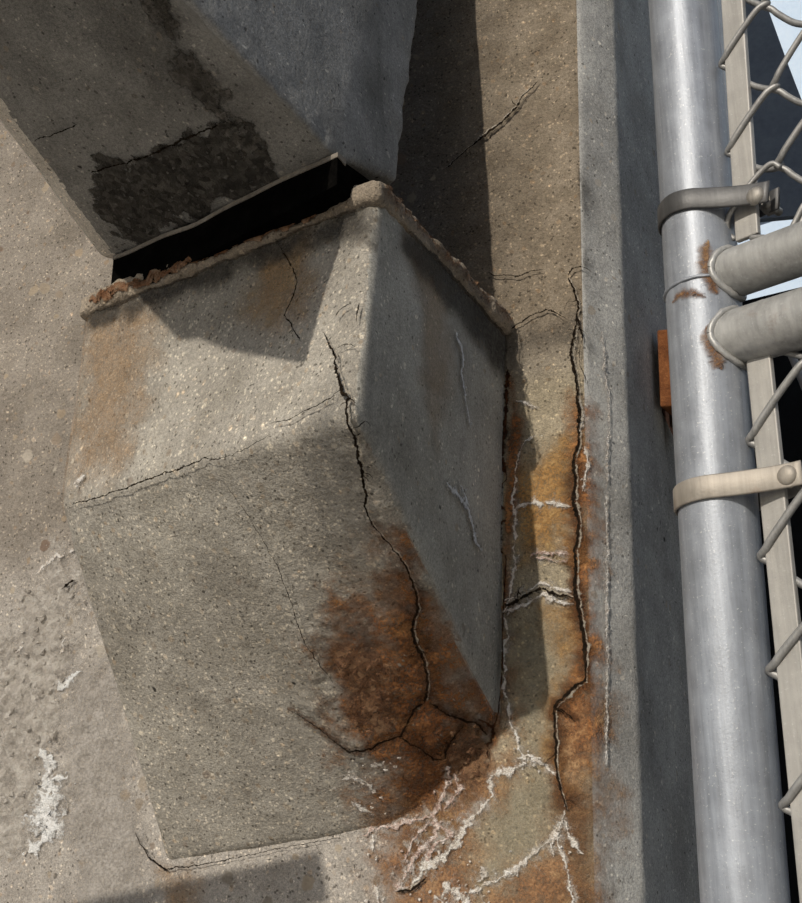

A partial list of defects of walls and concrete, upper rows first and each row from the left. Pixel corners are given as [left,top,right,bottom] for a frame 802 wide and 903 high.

spalling [88,0,280,252]
crack [446,82,537,168]
spalling [89,214,316,303]
crack [280,247,300,340]
damp [21,663,142,903]
crack [135,832,341,880]
crack [72,266,593,810]
damp [335,757,401,813]
corrosion [328,532,514,903]
damp [363,435,583,903]
corrosion [486,401,609,903]